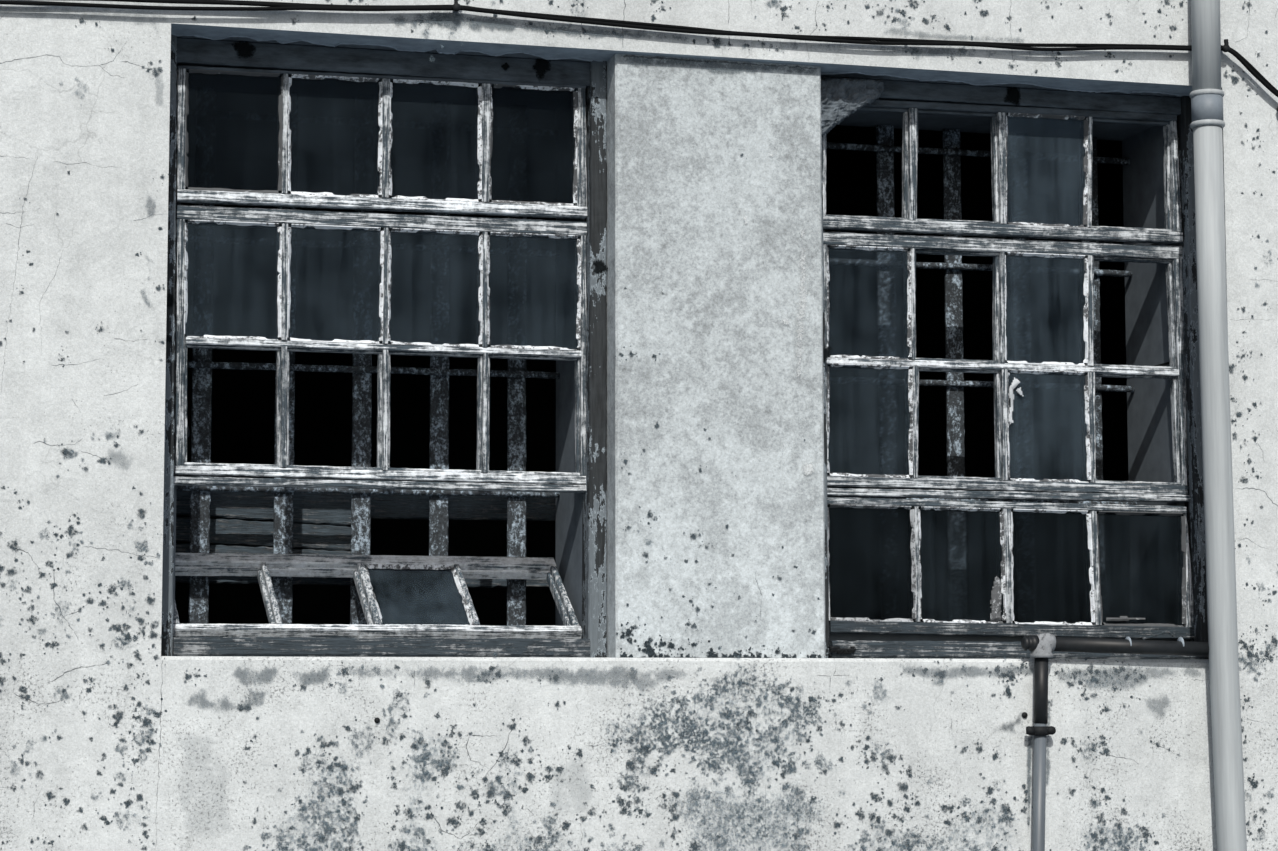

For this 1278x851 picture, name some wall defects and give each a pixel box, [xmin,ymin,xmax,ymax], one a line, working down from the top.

damp [56,433,119,477]
damp [0,486,167,851]
damp [184,668,276,750]
damp [244,636,1032,851]
damp [624,588,714,655]
damp [1046,658,1159,851]